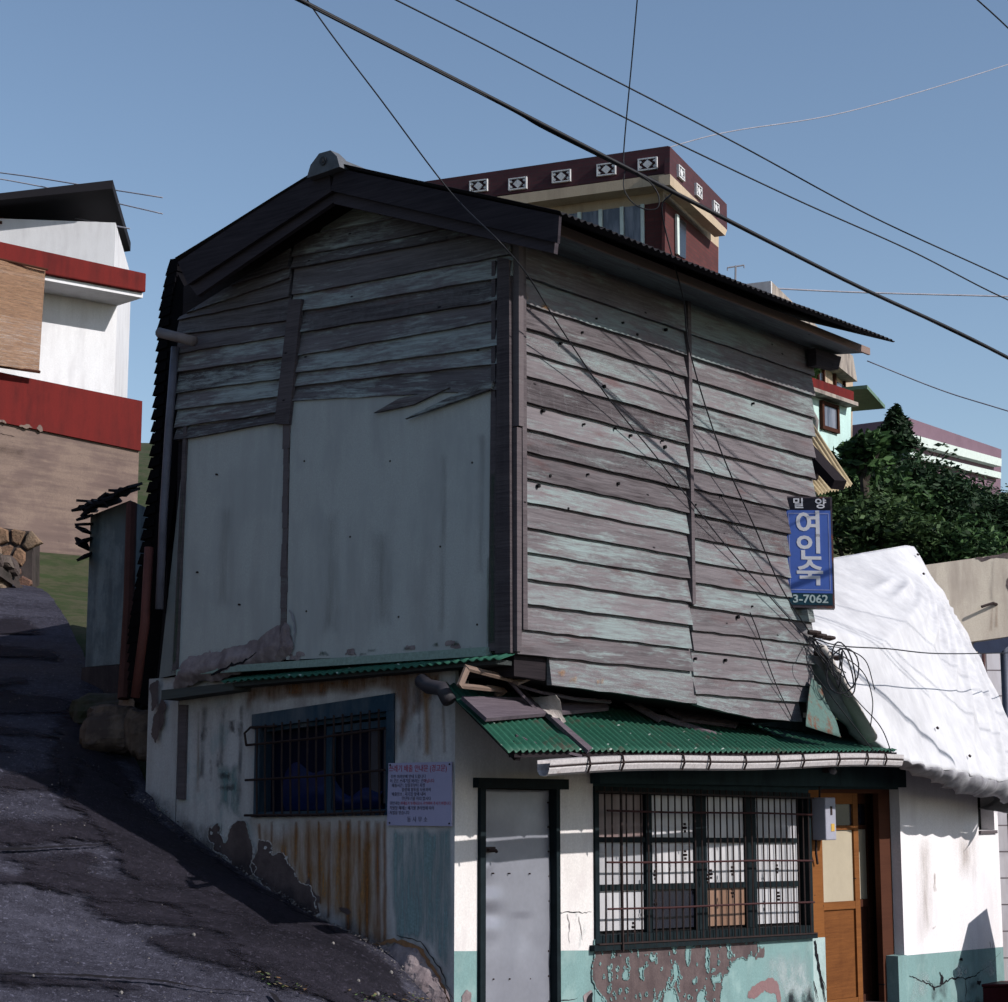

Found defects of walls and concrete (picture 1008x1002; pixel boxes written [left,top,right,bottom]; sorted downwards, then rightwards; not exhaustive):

peeling [206,820,321,919]
rust [259,822,386,941]
flaking render [373,935,471,1002]
peeling [583,939,765,1002]
crack [910,943,1001,996]